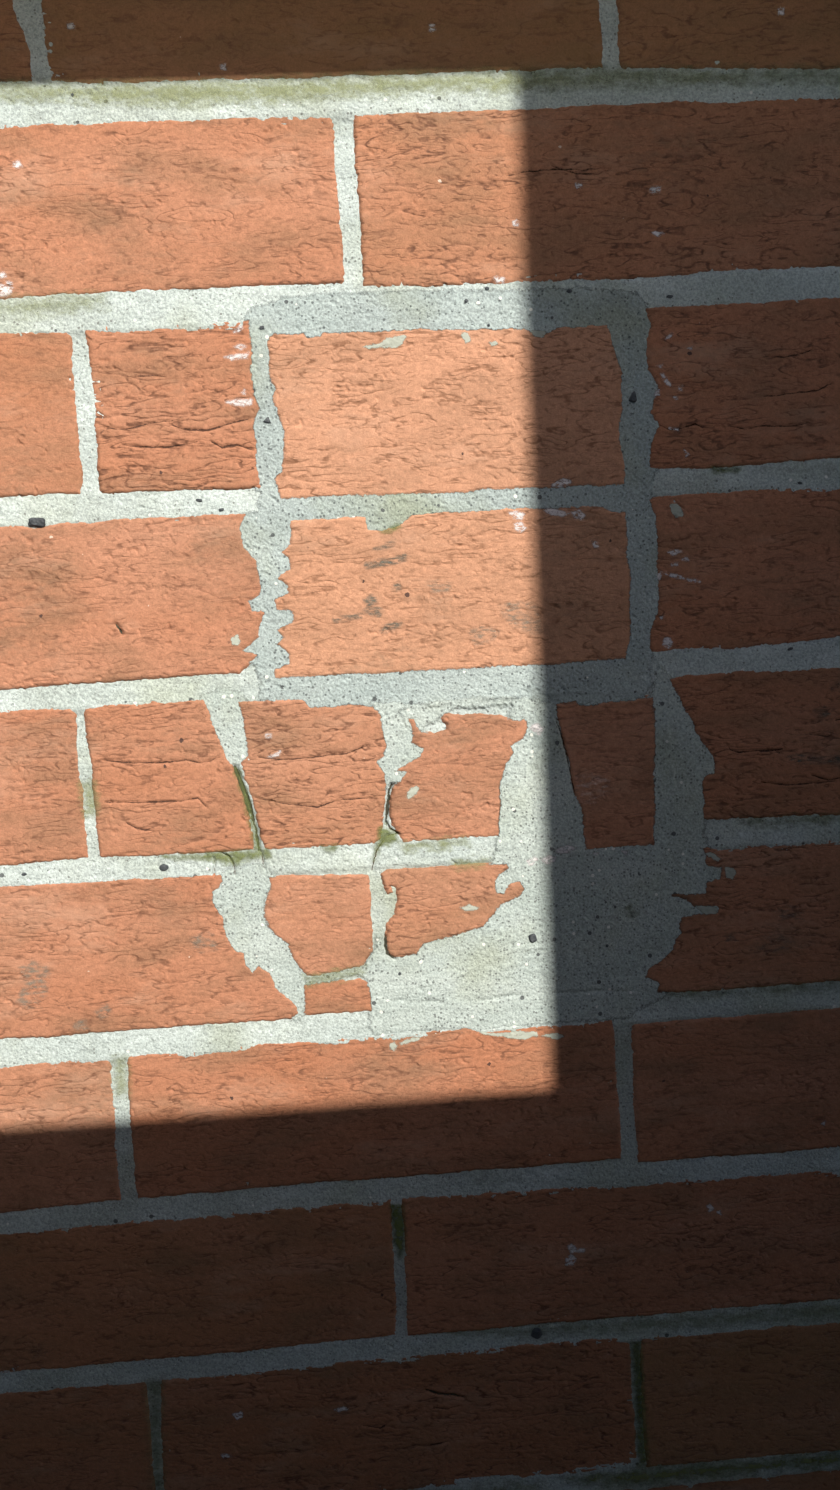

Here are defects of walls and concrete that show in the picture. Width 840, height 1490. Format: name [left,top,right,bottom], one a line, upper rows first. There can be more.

crack [107,746,397,872]